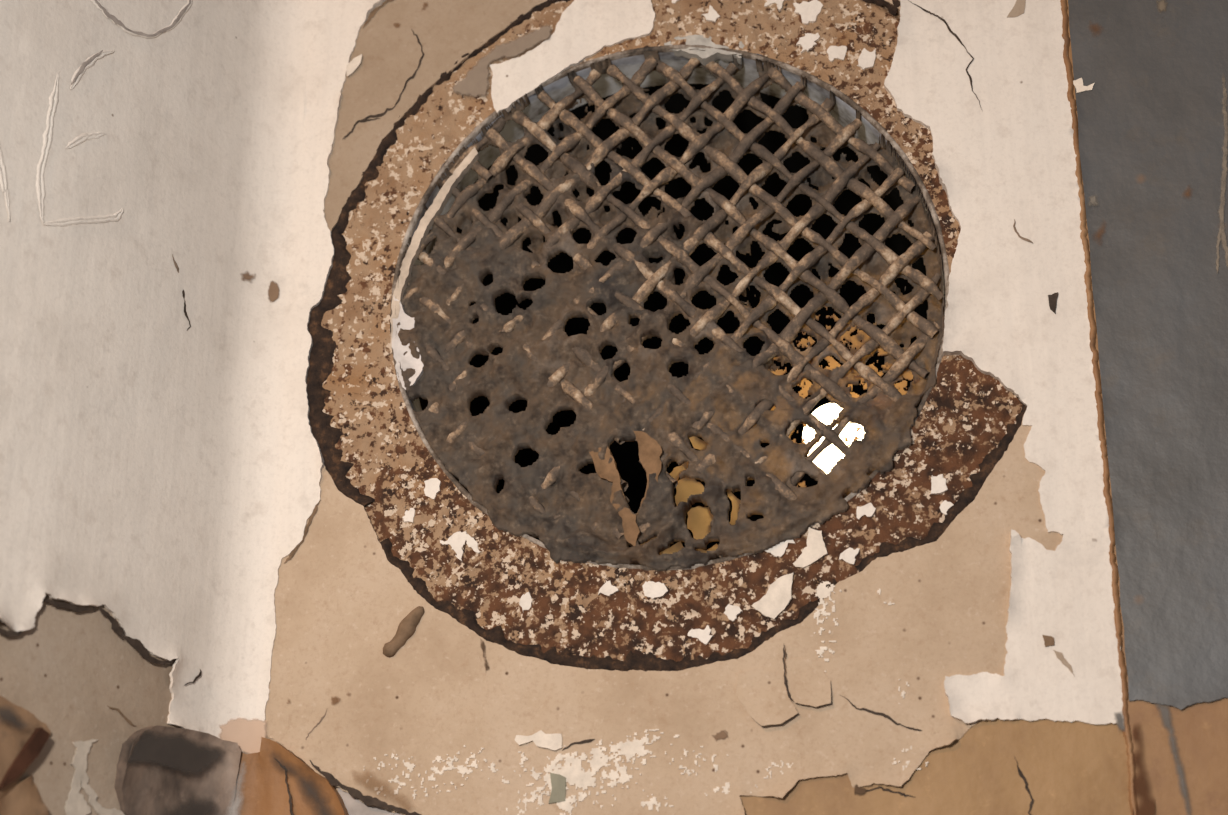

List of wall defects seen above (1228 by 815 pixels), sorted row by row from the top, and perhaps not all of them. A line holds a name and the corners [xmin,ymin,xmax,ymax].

crack [342,30,424,140]
peeling [324,0,547,232]
peeling [490,0,655,116]
peeling [764,0,876,71]
rust [862,0,900,16]
crack [908,0,981,107]
peeling [390,147,480,390]
rust [307,0,570,506]
rust [855,393,1027,572]
peeling [0,413,1132,815]
crack [783,646,793,700]
crack [844,697,922,731]